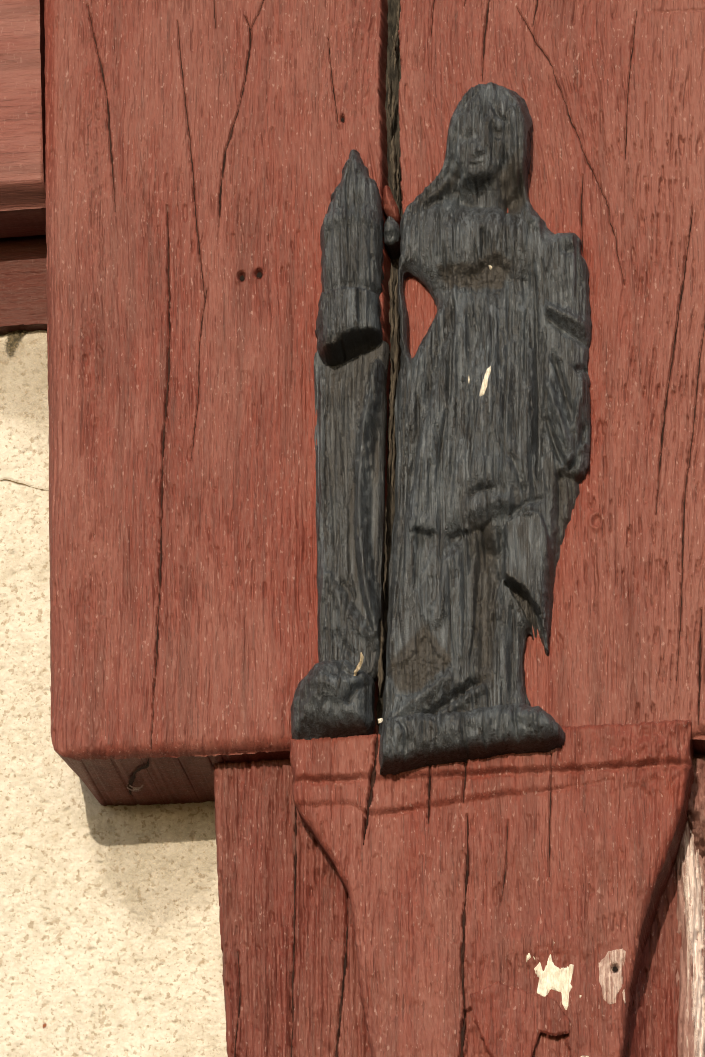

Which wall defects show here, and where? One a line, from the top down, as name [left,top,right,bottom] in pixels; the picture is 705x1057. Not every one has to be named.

crack [88,8,115,202]
crack [177,0,264,455]
crack [385,0,403,218]
crack [464,0,489,74]
crack [517,0,624,282]
crack [127,213,170,796]
crack [363,257,402,845]
crack [335,908,348,1057]
crack [460,762,469,1057]
peeling [470,942,581,1057]
peeling [599,948,626,1004]